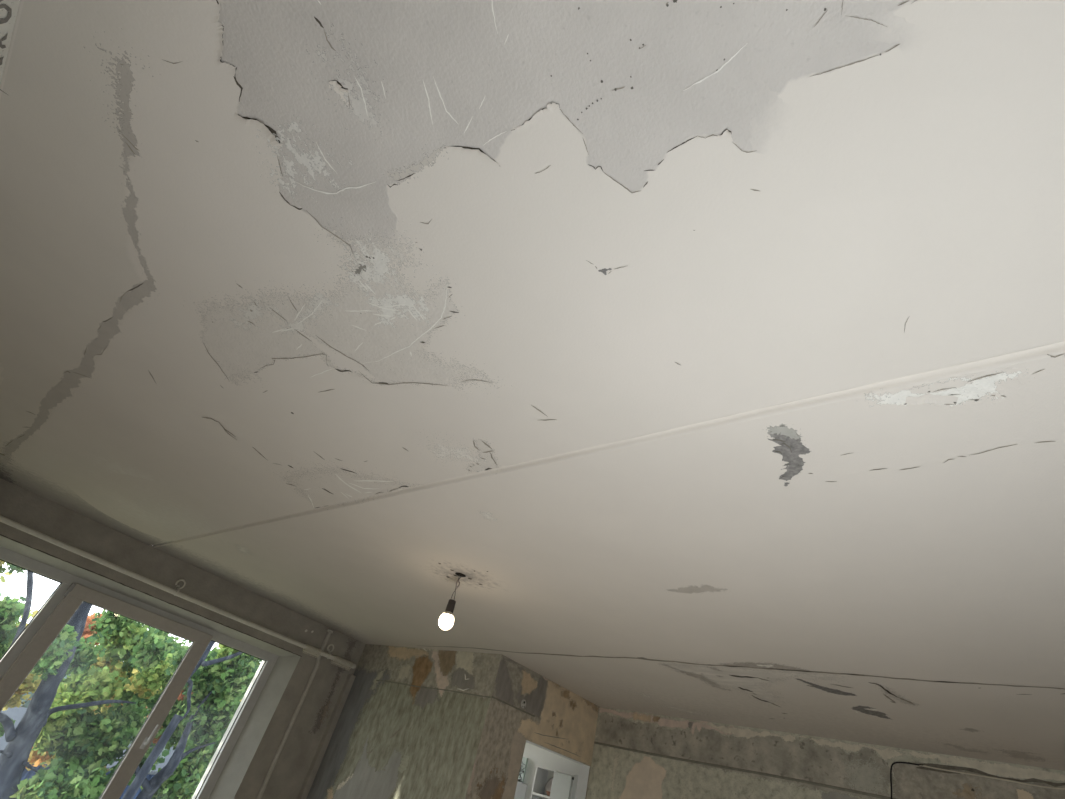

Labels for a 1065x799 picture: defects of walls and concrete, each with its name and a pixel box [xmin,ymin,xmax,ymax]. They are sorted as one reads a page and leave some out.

peeling [209,0,999,276]
peeling [0,45,157,465]
peeling [865,369,1044,407]
spalling [767,424,810,486]
crack [432,646,1065,706]
peeling [306,644,549,799]
peeling [596,714,1065,799]